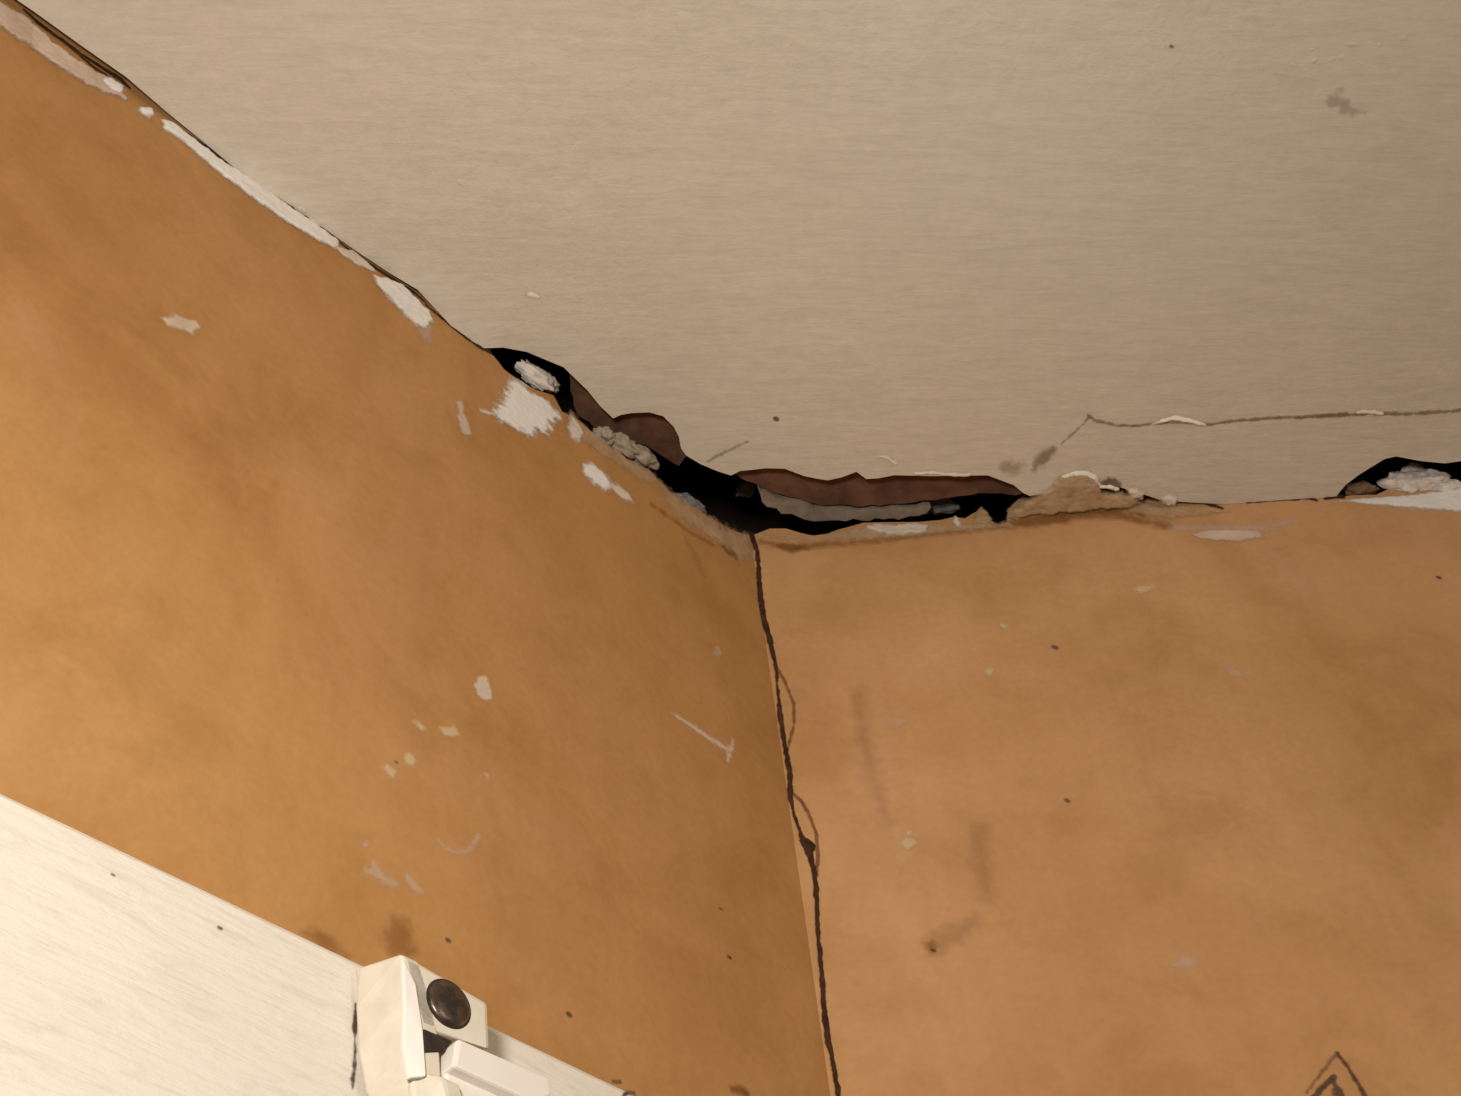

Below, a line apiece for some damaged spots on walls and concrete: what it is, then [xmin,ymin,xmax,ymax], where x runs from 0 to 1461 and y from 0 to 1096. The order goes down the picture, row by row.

spalling [488,348,1221,559]
crack [1034,408,1461,468]
spalling [1339,456,1461,496]
crack [748,531,841,1096]